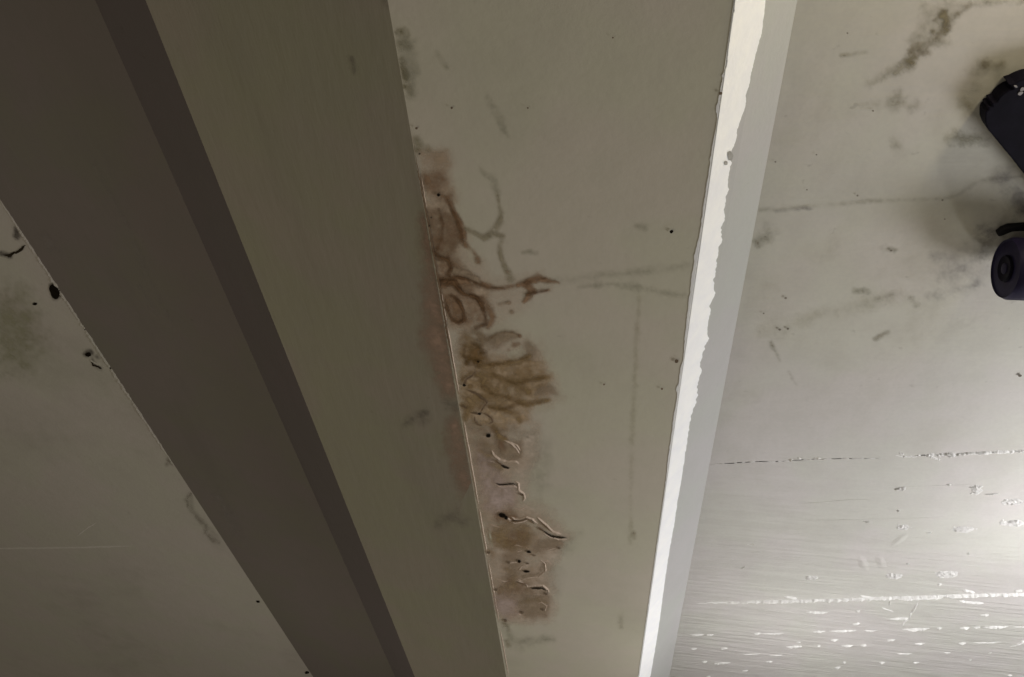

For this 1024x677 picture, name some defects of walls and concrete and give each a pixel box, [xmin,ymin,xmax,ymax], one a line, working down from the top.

mould [932,10,949,39]
water stain [460,331,555,441]
peeling [466,425,570,623]